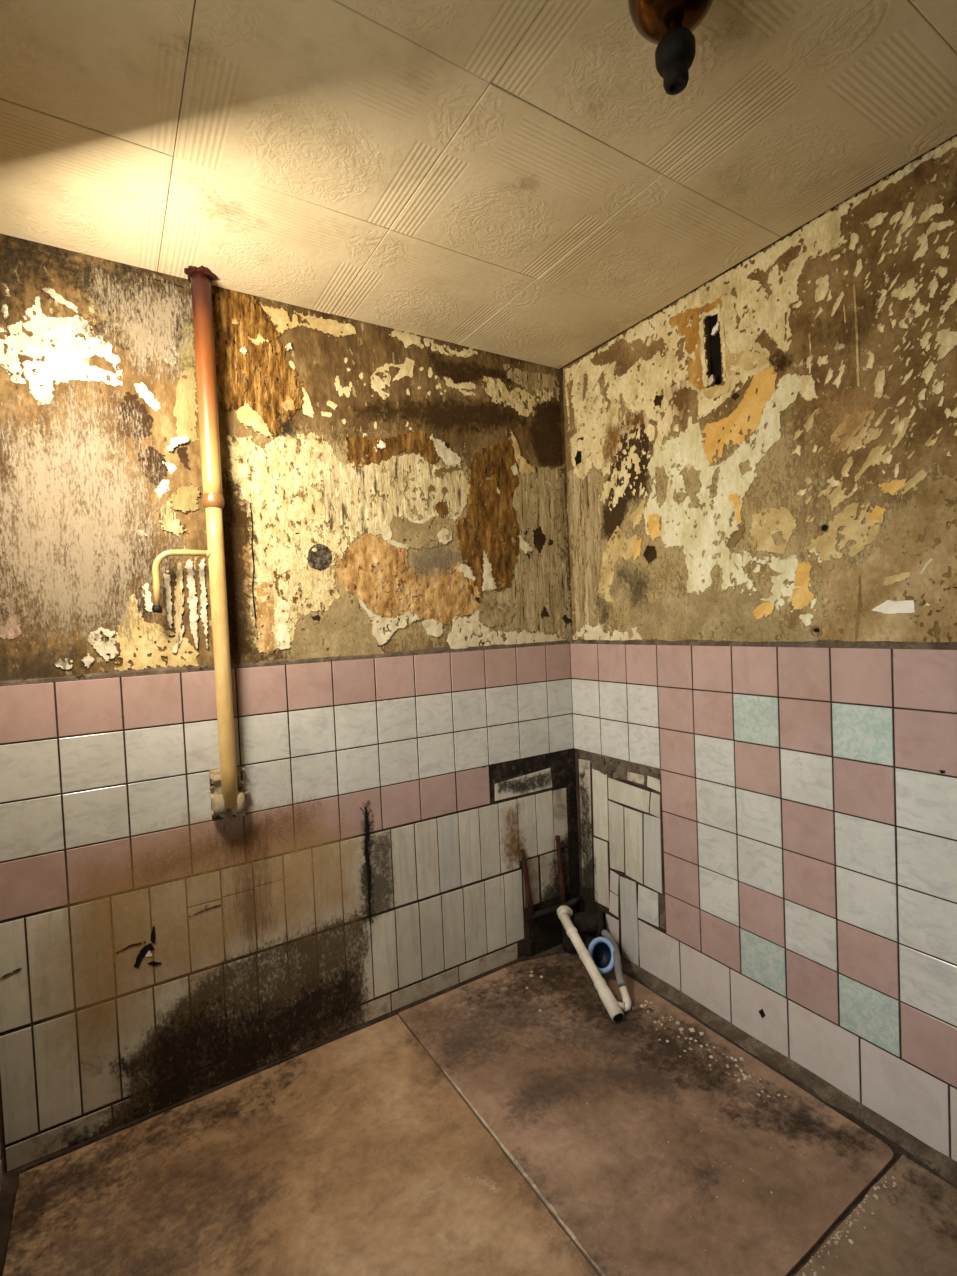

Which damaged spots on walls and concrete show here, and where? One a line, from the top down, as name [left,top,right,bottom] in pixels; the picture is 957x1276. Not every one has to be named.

flaking render [0,283,200,539]
peeling [225,136,957,655]
peeling [0,597,22,640]
flaking render [54,594,199,671]
damp [361,801,392,924]
corrosion [505,807,521,867]
peeling [482,749,661,956]
damp [5,1100,239,1276]